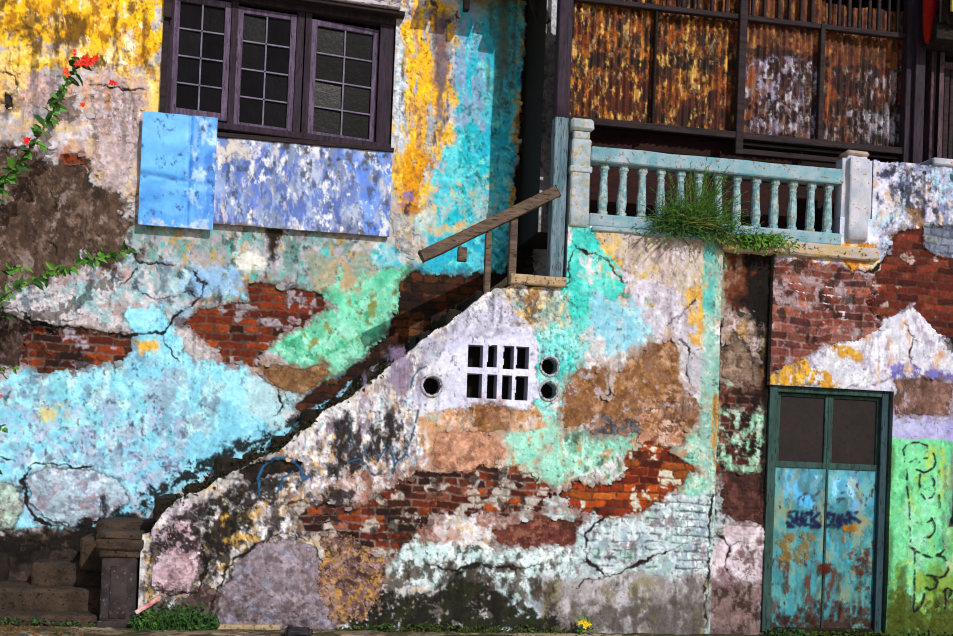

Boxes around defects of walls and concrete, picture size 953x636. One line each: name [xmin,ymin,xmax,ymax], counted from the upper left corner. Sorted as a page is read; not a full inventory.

flaking render [17,327,132,373]
crack [0,246,208,359]
flaking render [183,280,327,368]
crack [566,241,624,287]
flaking render [720,221,953,373]
crack [0,456,92,527]
flaking render [287,338,700,557]
leakage [349,567,707,635]
crack [576,514,673,589]
rust [776,531,873,629]